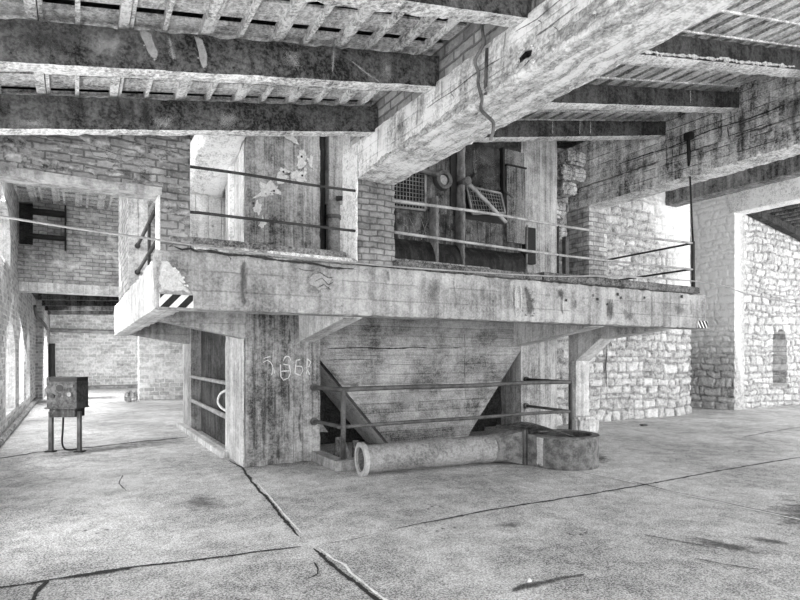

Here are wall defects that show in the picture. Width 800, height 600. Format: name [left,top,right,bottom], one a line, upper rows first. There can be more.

peeling [252,136,313,229]
peeling [158,260,191,293]
water stain [252,352,276,449]
crack [0,460,388,600]
crack [390,457,800,530]